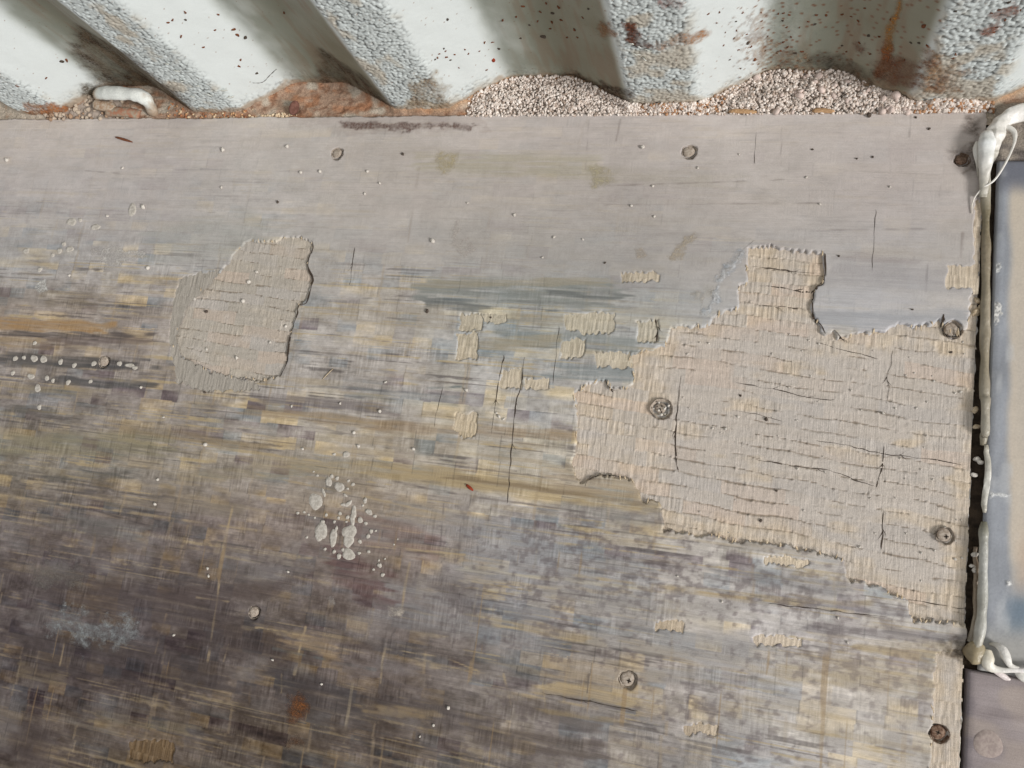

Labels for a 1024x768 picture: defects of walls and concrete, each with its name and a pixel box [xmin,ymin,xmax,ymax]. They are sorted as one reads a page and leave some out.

rust [26,103,68,115]
rust [59,27,299,119]
rust [707,11,827,69]
rust [841,2,960,94]
peeling [169,237,313,393]
crack [492,358,524,503]
peeling [499,368,549,390]
crack [672,379,681,470]
peeling [560,199,982,626]